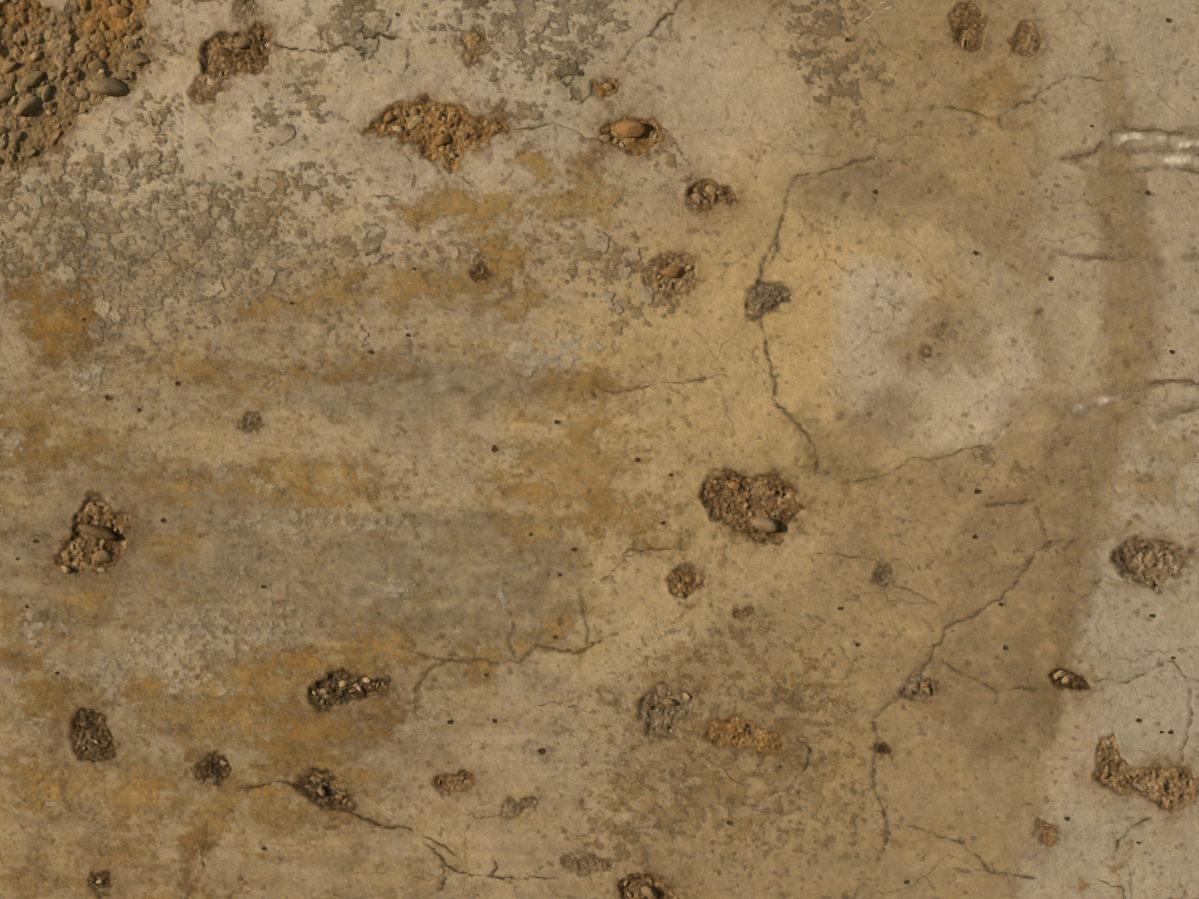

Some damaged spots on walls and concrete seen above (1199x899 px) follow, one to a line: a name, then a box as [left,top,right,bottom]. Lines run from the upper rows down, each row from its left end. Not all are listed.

flaking render [366,0,630,171]
spalling [0,0,495,365]
crack [760,157,873,277]
crack [1062,128,1199,174]
crack [760,321,818,469]
spalling [53,491,133,577]
spalling [699,469,803,545]
crack [900,500,1074,672]
spalling [308,668,390,713]
crack [872,690,1033,879]
spalling [1092,733,1199,811]
crack [340,803,547,890]